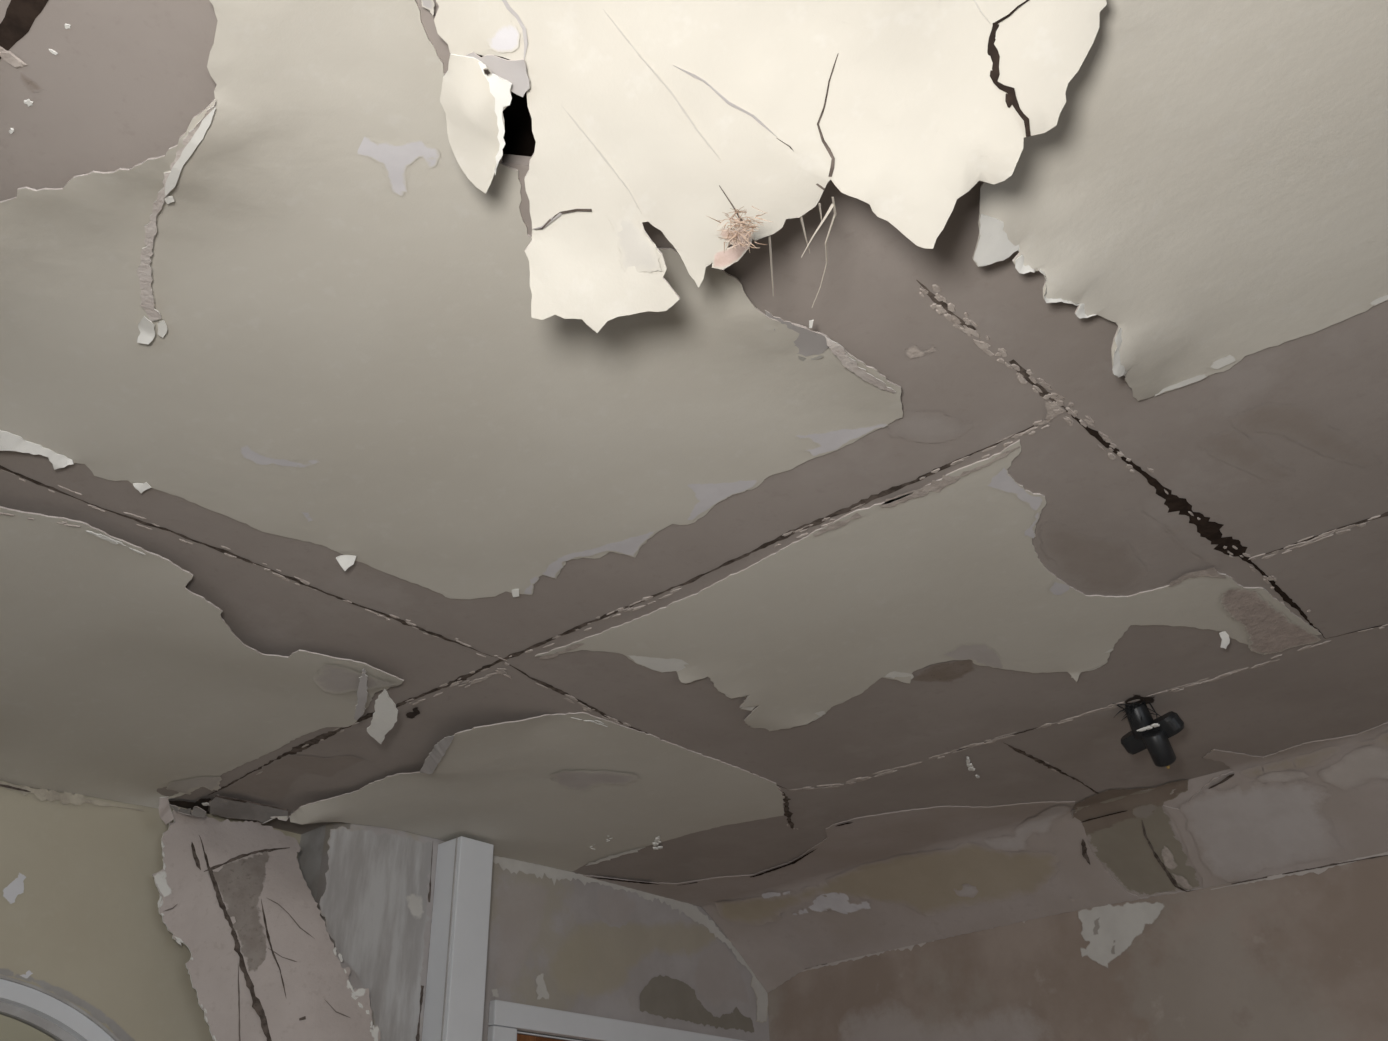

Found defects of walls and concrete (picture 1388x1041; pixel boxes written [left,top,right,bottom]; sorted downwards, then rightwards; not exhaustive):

crack [0,0,71,134]
peeling [336,555,356,571]
crack [0,280,1388,877]
peeling [367,689,398,744]
crack [1211,852,1388,890]